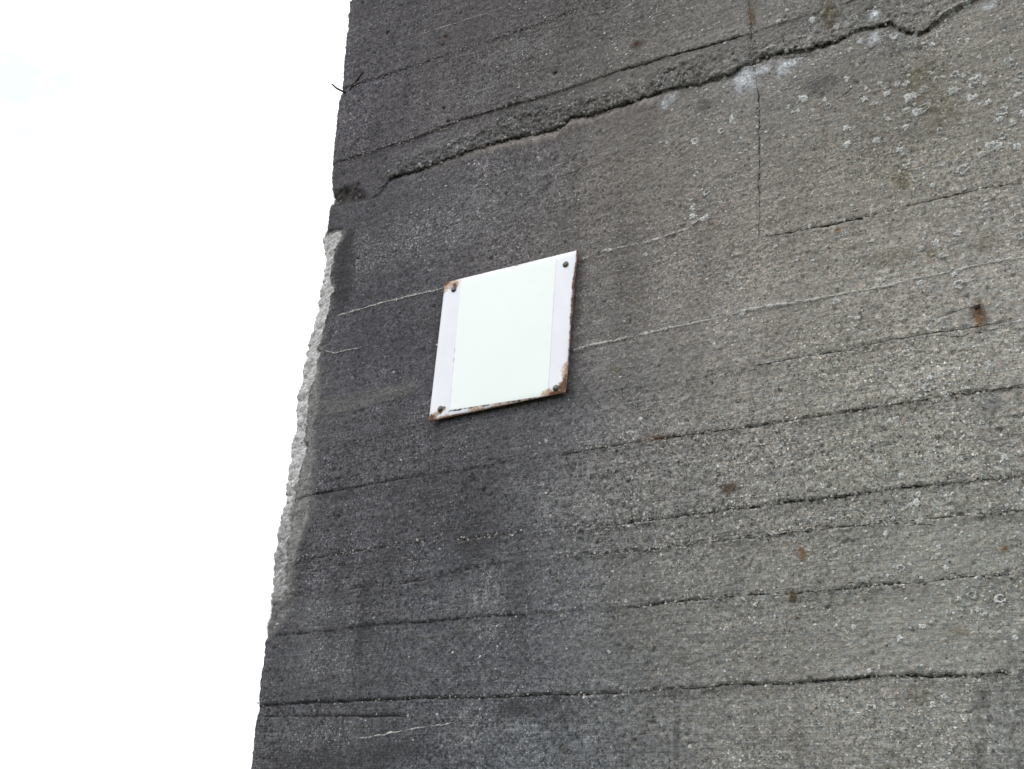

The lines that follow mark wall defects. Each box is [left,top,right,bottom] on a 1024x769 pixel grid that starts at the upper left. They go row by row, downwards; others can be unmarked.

crack [350,1,601,85]
crack [333,94,540,165]
crack [390,0,1021,237]
spalling [271,229,344,631]
crack [557,385,1021,458]
crack [571,474,1023,558]
crack [625,567,1017,609]
crack [272,614,511,636]
crack [257,667,1024,718]